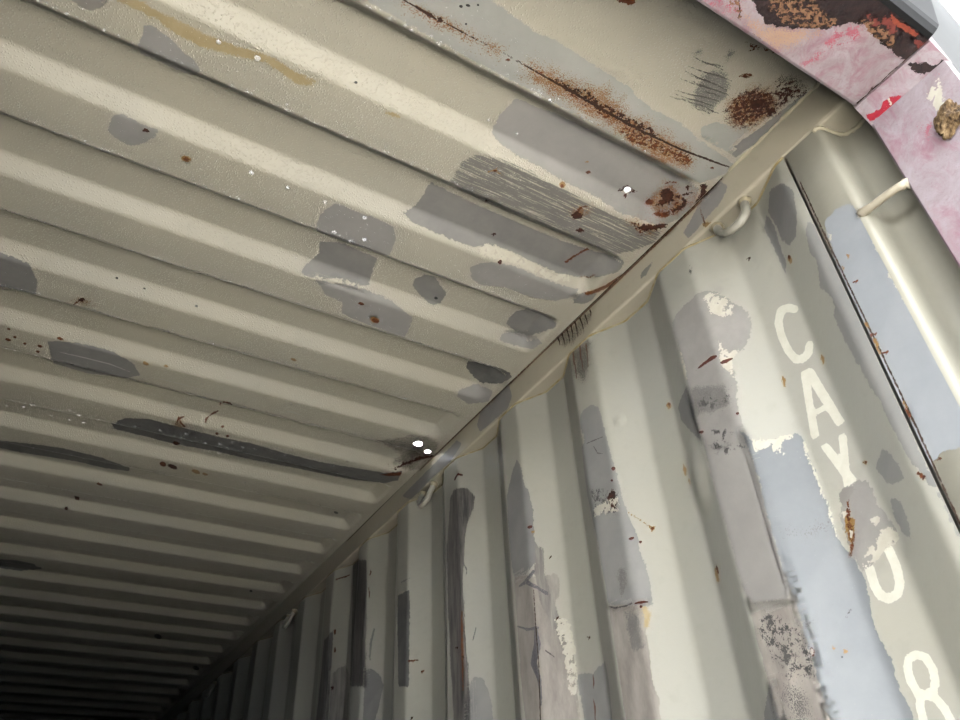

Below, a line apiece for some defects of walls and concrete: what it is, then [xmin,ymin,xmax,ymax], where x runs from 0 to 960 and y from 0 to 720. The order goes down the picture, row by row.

peeling [705,0,895,66]
rust [722,72,809,133]
peeling [866,95,901,121]
peeling [915,78,945,143]
rust [379,0,729,477]
spalling [703,291,734,317]
peeling [751,434,793,455]
peeling [800,441,856,537]
rust [842,501,855,558]
peeling [862,516,899,567]